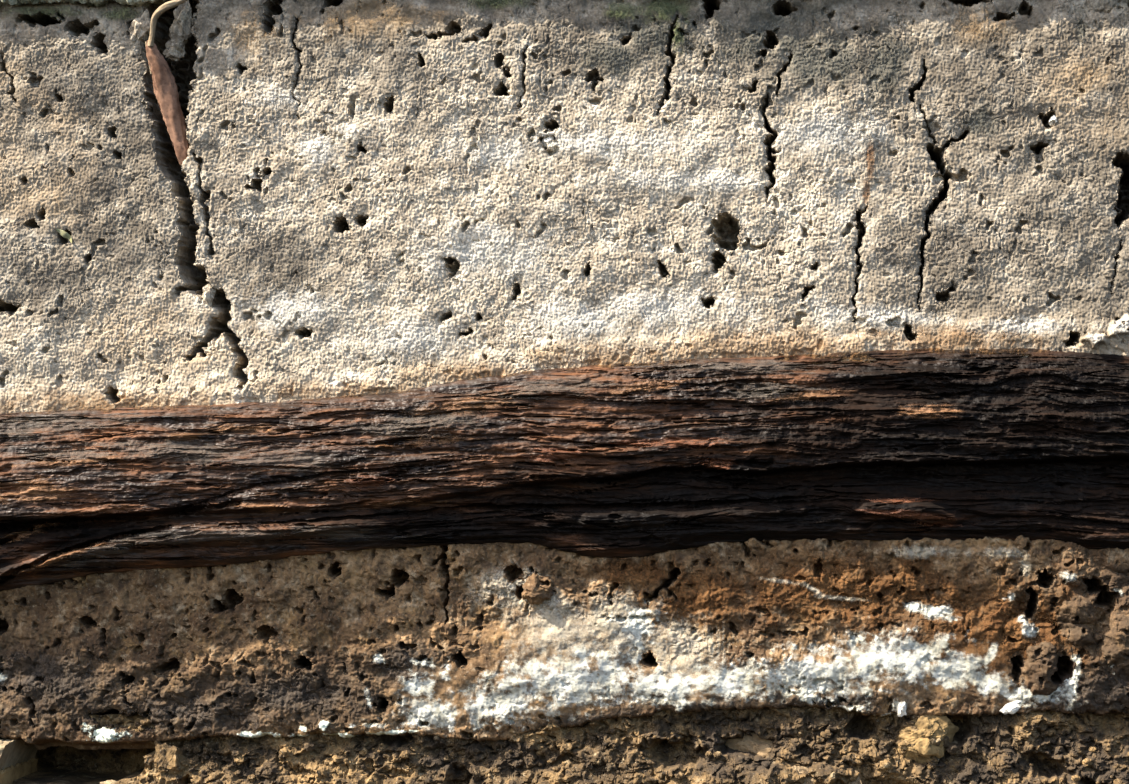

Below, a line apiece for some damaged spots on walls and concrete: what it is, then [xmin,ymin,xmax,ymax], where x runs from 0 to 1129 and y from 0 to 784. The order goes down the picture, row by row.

crack [138,0,250,390]
crack [761,52,793,199]
crack [907,58,970,313]
crack [1108,151,1129,296]
crack [0,297,21,316]
water stain [0,600,1129,743]